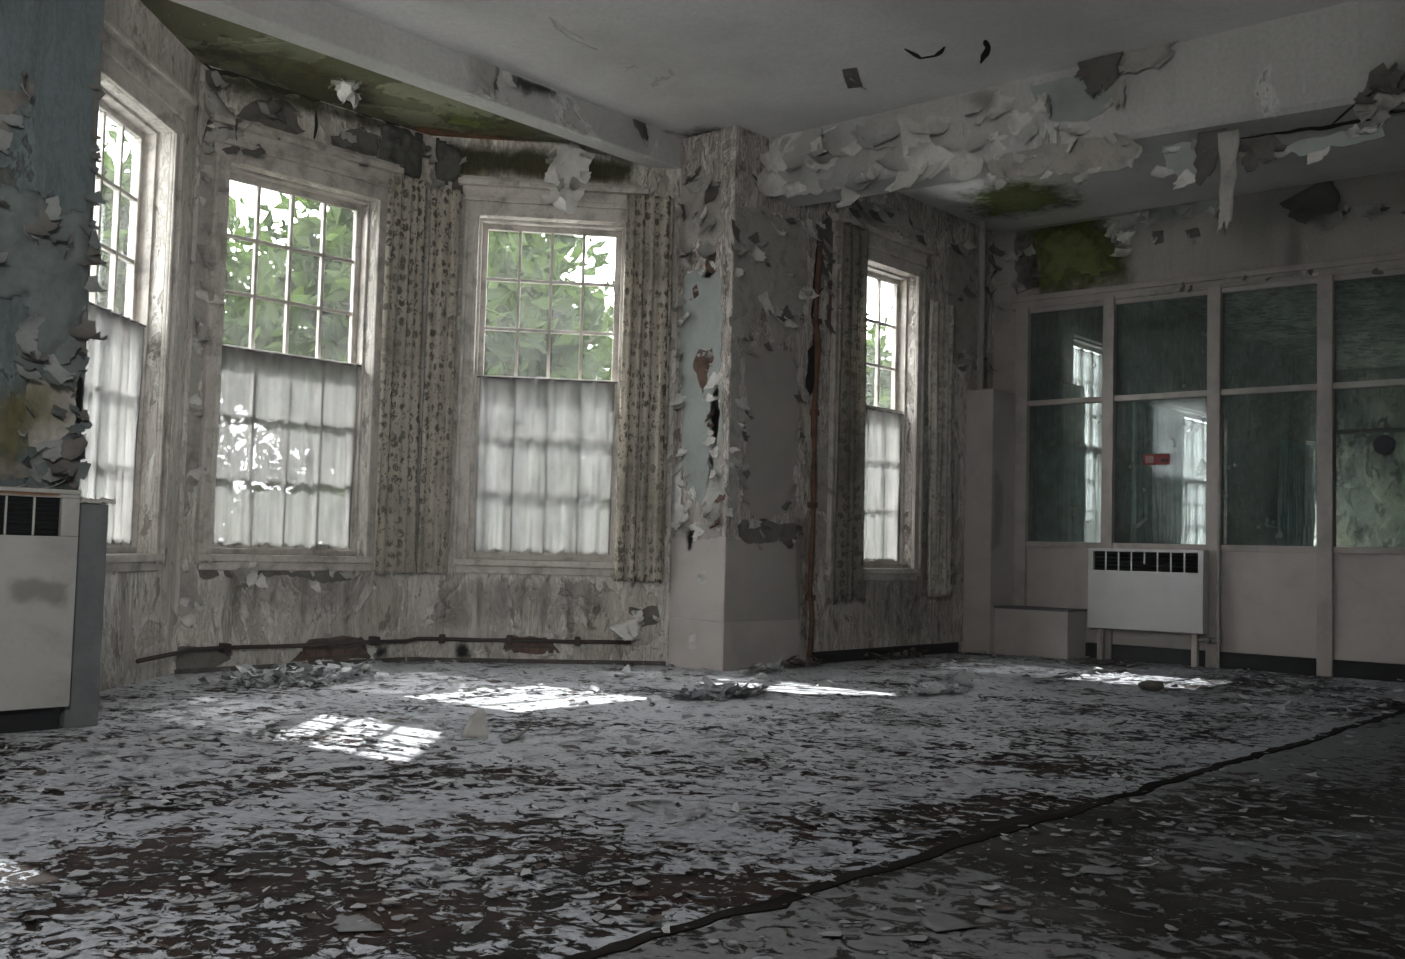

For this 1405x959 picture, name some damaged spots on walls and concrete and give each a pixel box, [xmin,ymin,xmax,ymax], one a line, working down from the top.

peeling [79,24,109,249]
peeling [236,99,305,141]
water stain [205,48,387,128]
peeling [328,78,381,167]
peeling [1150,138,1204,189]
peeling [1225,62,1405,173]
peeling [670,65,1142,570]
peeling [0,311,116,504]
flaking render [291,631,377,662]